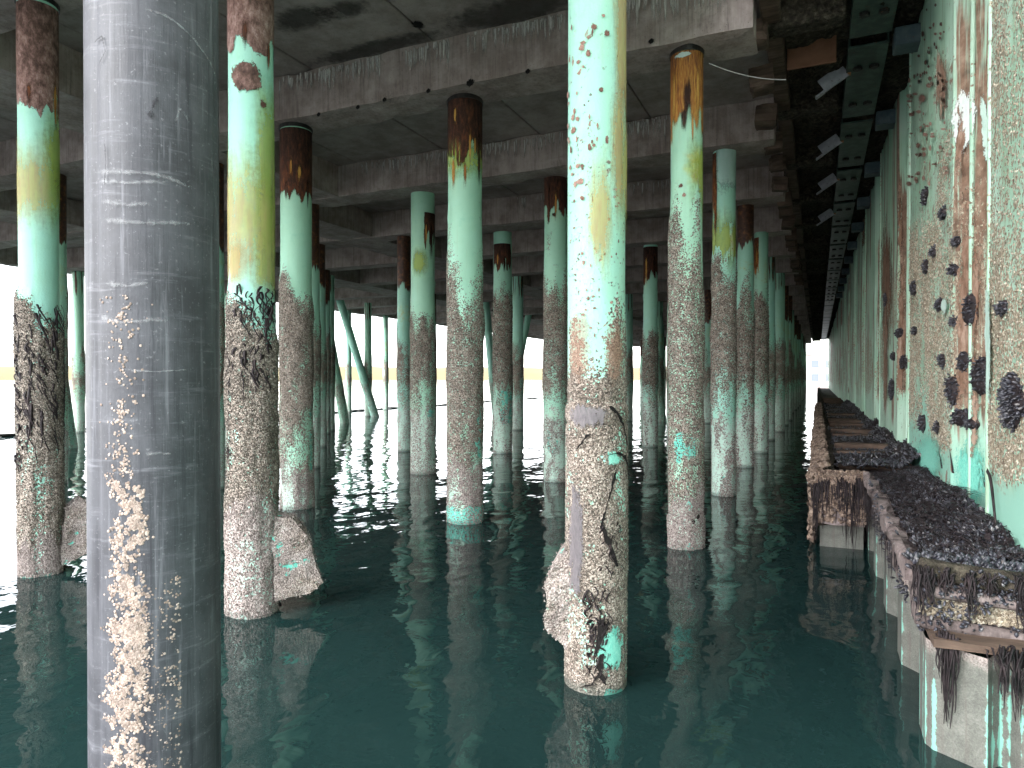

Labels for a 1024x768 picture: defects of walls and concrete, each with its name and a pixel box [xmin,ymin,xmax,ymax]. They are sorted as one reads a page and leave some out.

corrosion [16,0,59,126]
corrosion [227,0,274,92]
corrosion [279,127,312,204]
corrosion [424,212,435,251]
corrosion [448,98,482,182]
corrosion [544,176,568,224]
corrosion [670,50,703,140]
peeling [906,22,987,186]
corrosion [879,198,906,407]
corrosion [956,183,982,457]
crack [577,406,629,567]
crack [580,619,610,688]